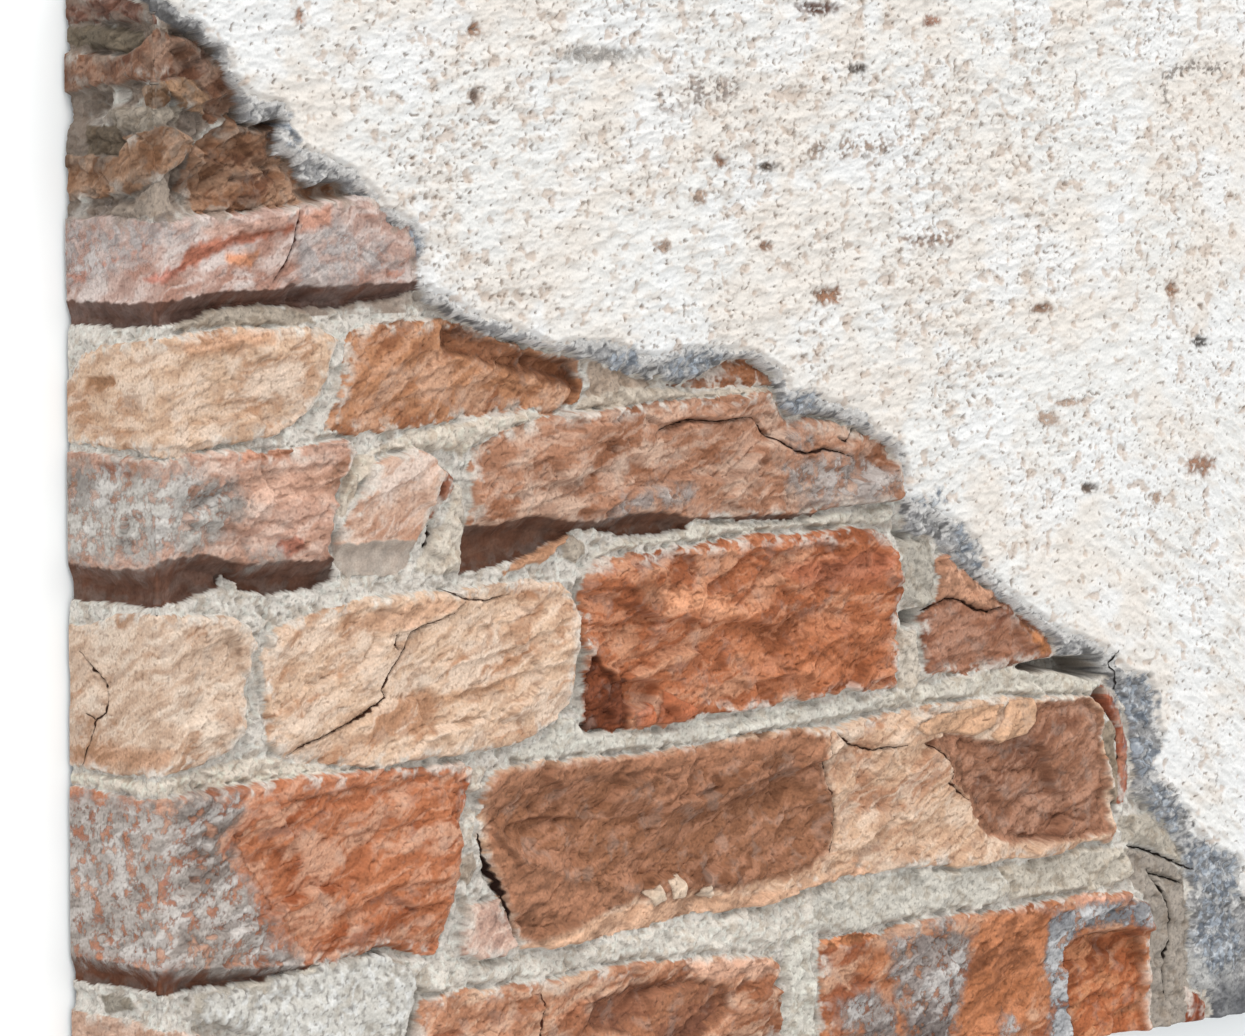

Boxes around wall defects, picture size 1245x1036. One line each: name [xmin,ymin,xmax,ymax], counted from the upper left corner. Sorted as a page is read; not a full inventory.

spalling [565,46,624,62]
spalling [798,3,838,15]
spalling [143,0,428,271]
crack [274,205,300,279]
crack [83,655,109,763]
crack [288,589,504,755]
spalling [417,275,1245,1018]
spalling [235,774,463,952]
crack [1126,845,1194,995]
spalling [589,979,735,1036]
spalling [1062,930,1146,1036]